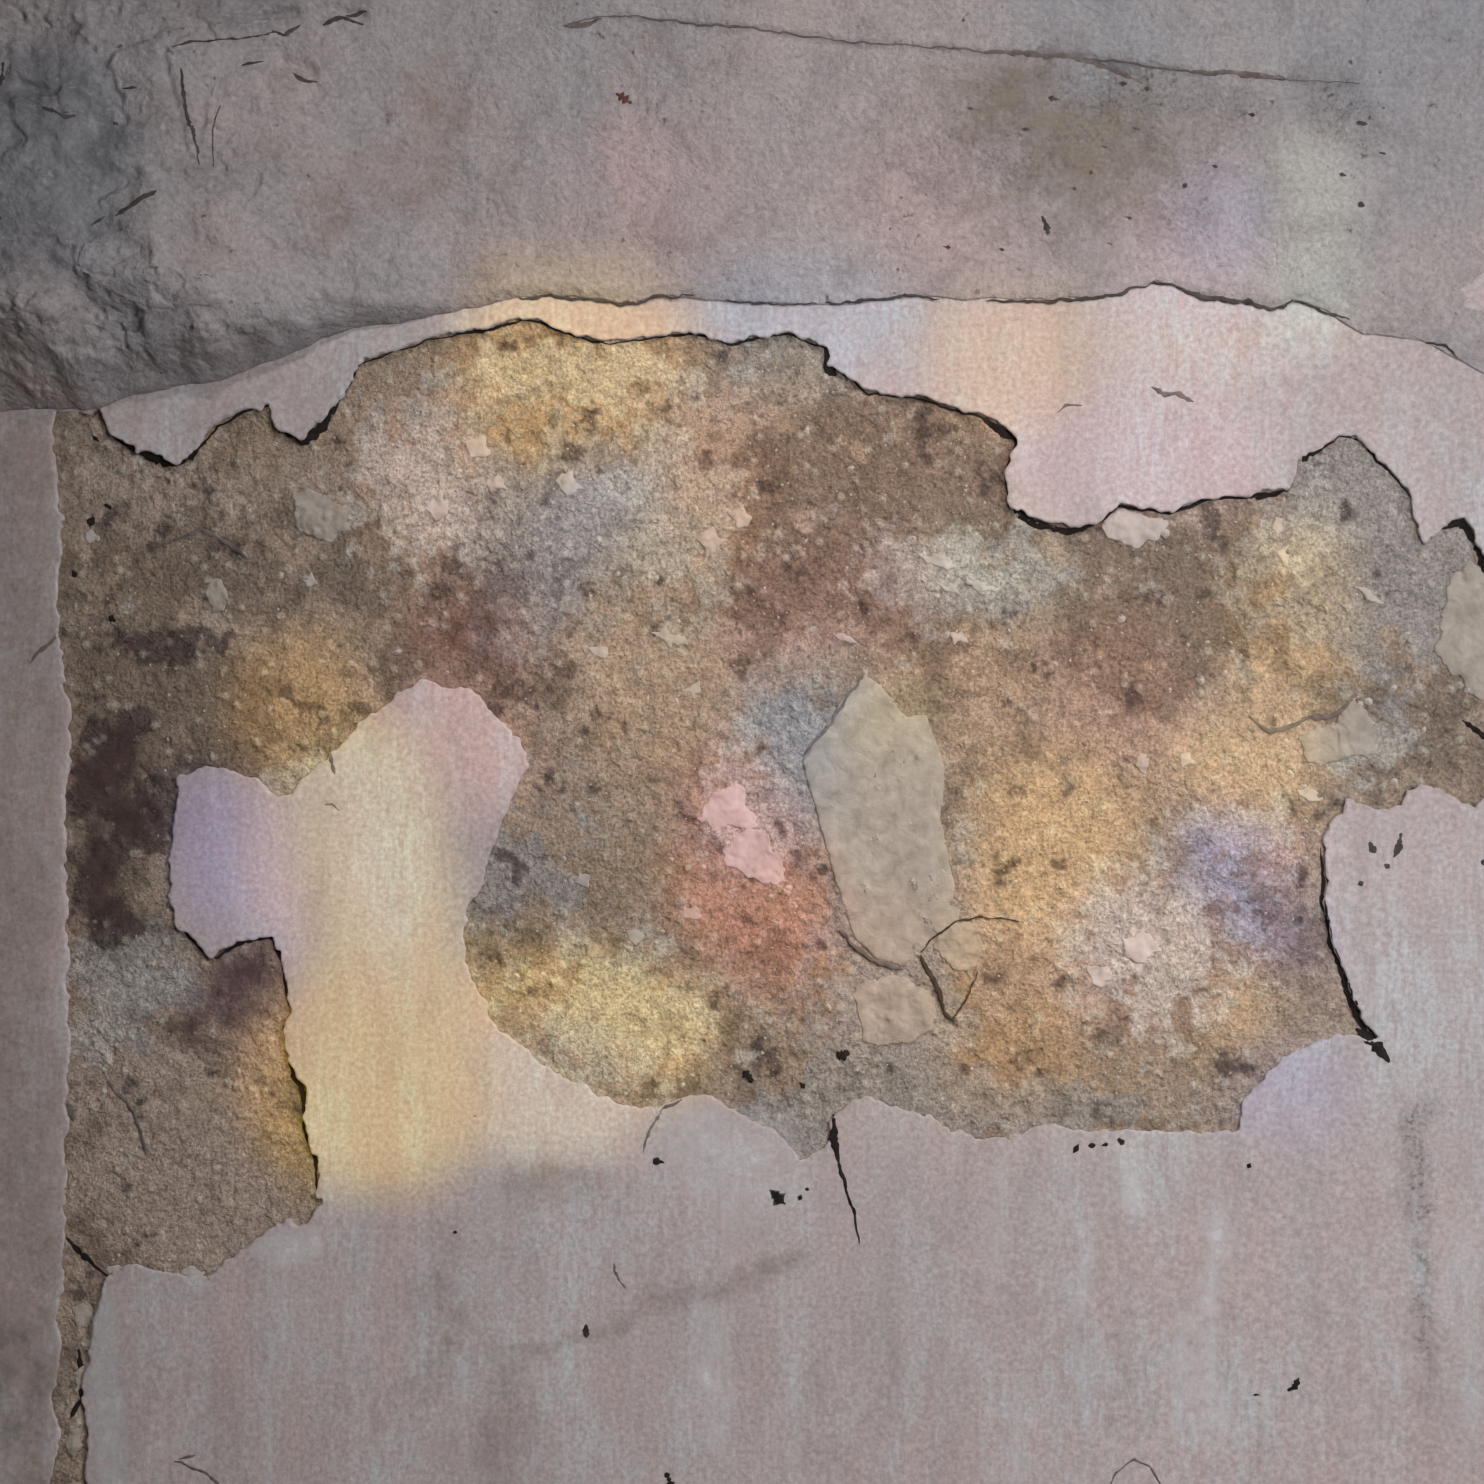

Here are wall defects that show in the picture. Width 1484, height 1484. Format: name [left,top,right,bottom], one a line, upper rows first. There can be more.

crack [564,15,1360,84]
crack [104,293,1411,536]
crack [986,281,1350,320]
crack [1426,342,1458,358]
spalling [50,319,1484,1484]
crack [839,915,1020,1022]
crack [1319,848,1391,1063]
crack [828,1114,860,1244]